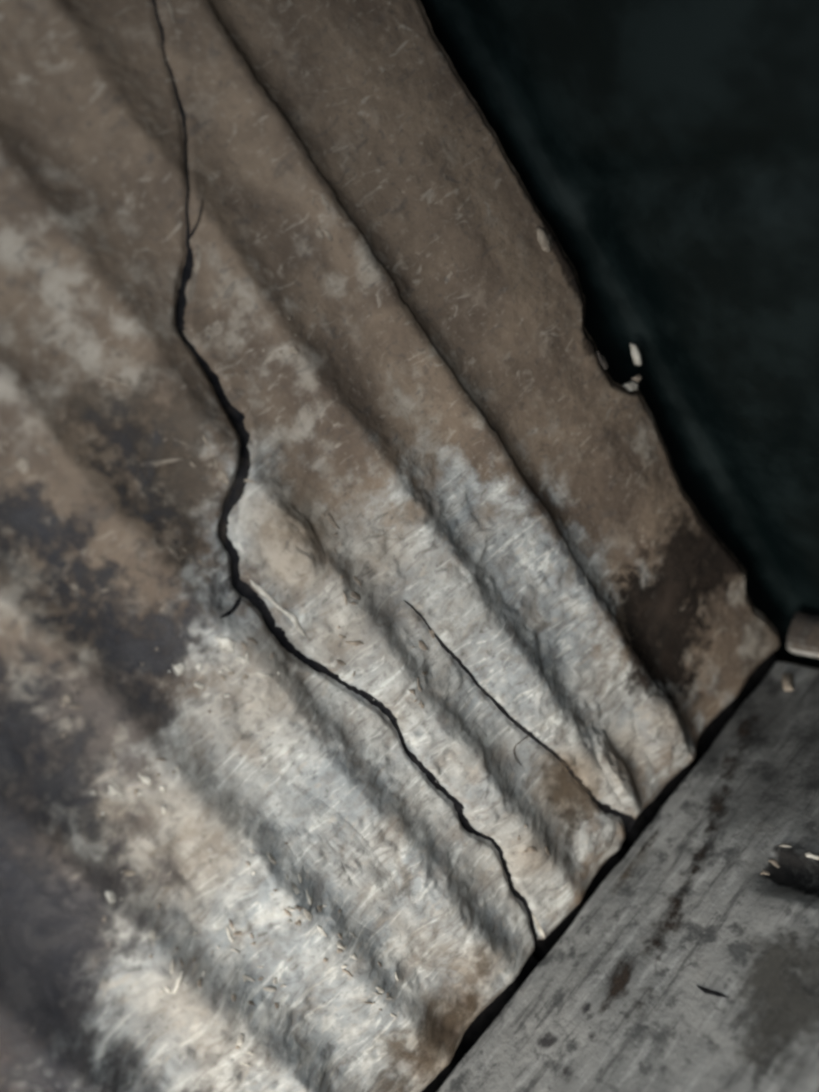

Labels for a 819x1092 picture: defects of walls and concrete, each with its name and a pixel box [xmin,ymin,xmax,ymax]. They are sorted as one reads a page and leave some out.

crack [152,0,545,944]
crack [403,600,636,832]